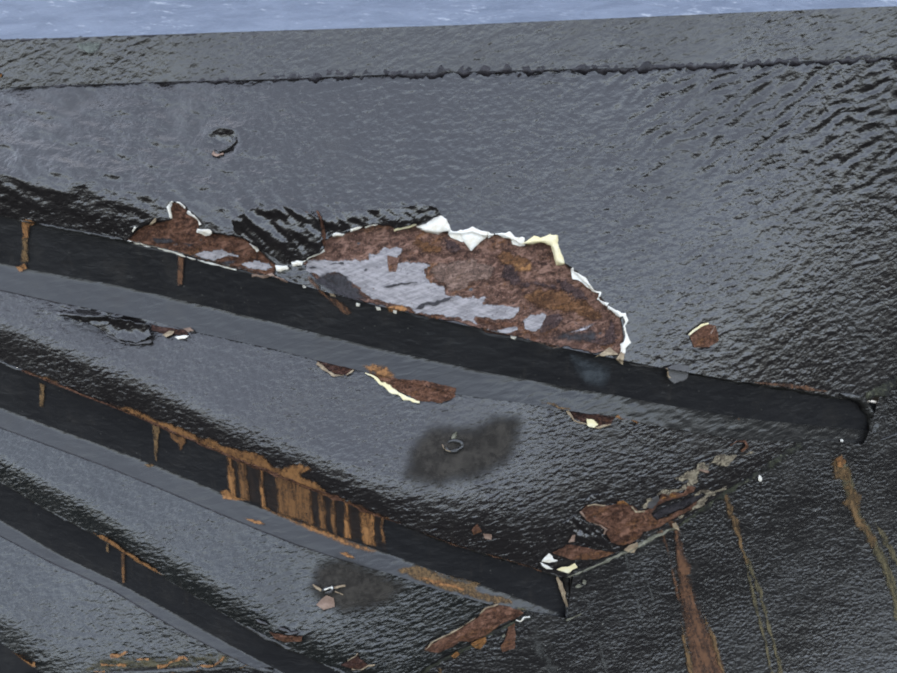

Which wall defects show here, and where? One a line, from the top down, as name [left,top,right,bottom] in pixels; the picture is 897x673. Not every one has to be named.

corrosion [16,220,34,272]
peeling [316,360,456,403]
peeling [128,201,689,384]
peeling [688,323,719,352]
corrosion [21,370,397,558]
damp [313,560,402,610]
damp [406,419,519,484]
peeling [424,604,530,658]
peeling [541,440,754,573]
corrosion [660,520,725,673]
corrosion [725,494,783,673]
corrosion [834,456,897,621]